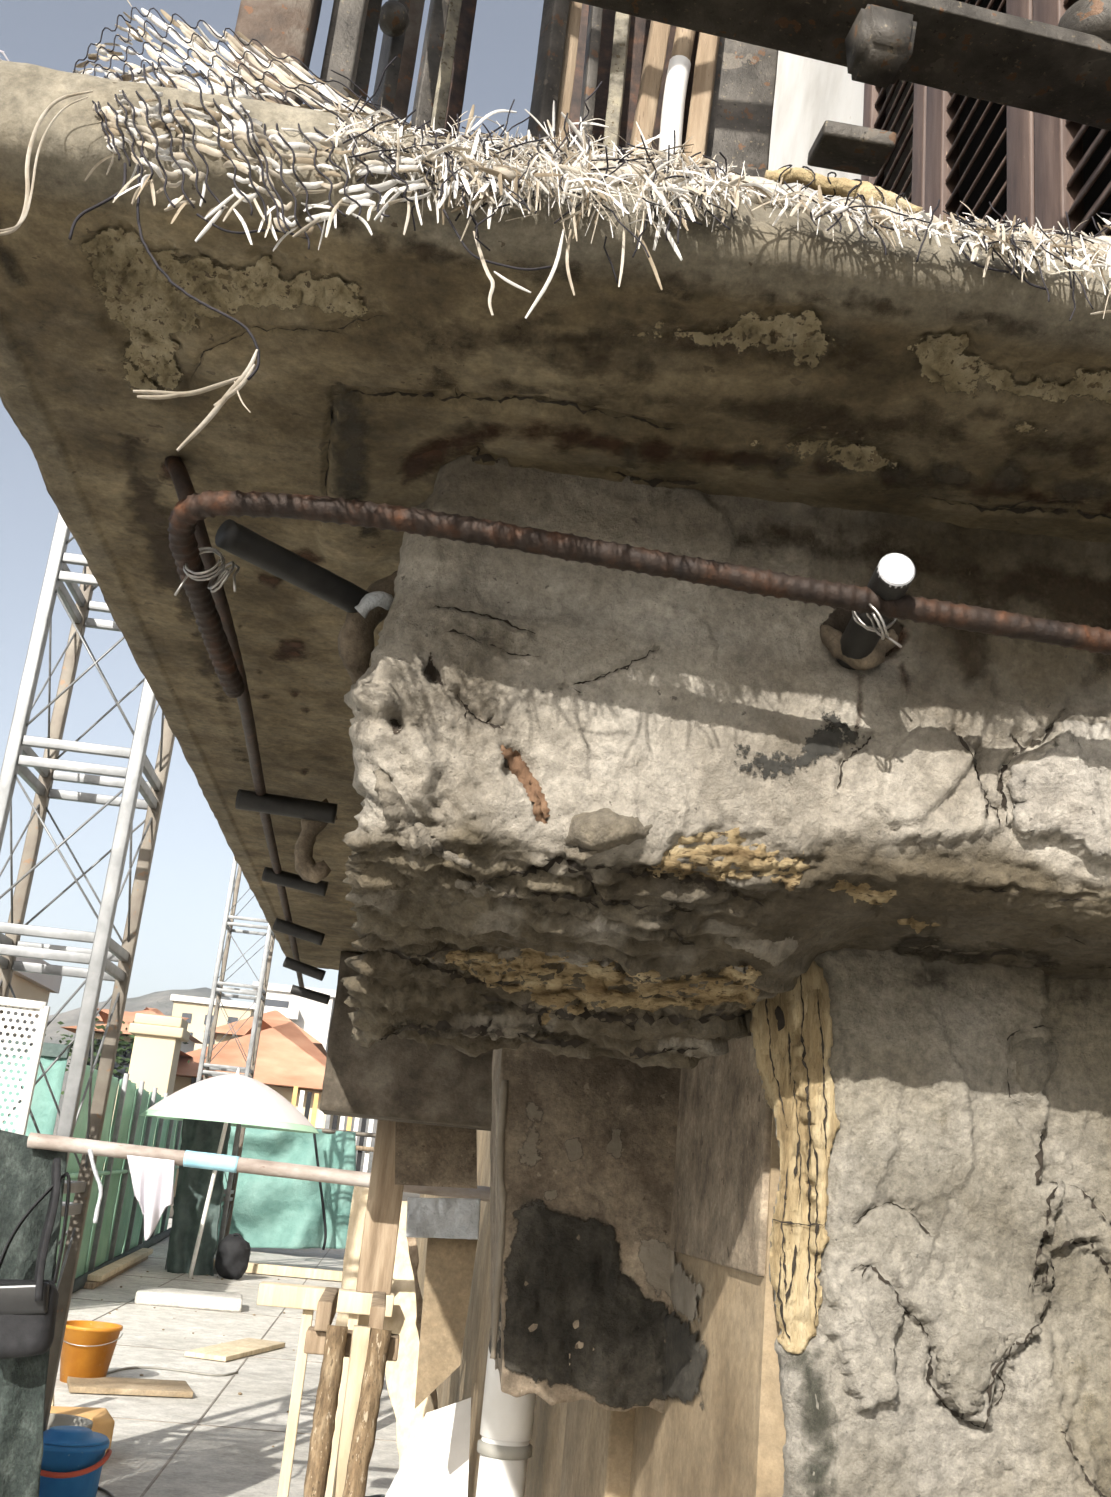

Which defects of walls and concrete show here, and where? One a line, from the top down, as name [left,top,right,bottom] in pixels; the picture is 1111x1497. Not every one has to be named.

leakage [298,211,354,233]
spalling [81,227,368,391]
corrosion [398,422,774,484]
leakage [124,437,227,708]
corrosion [258,641,307,674]
corrosion [885,630,908,688]
spalling [165,456,1111,988]
mould [734,711,864,781]
crack [958,716,1061,823]
flaking render [432,948,840,1354]
crack [851,1025,1111,1429]
crack [1061,1431,1107,1497]